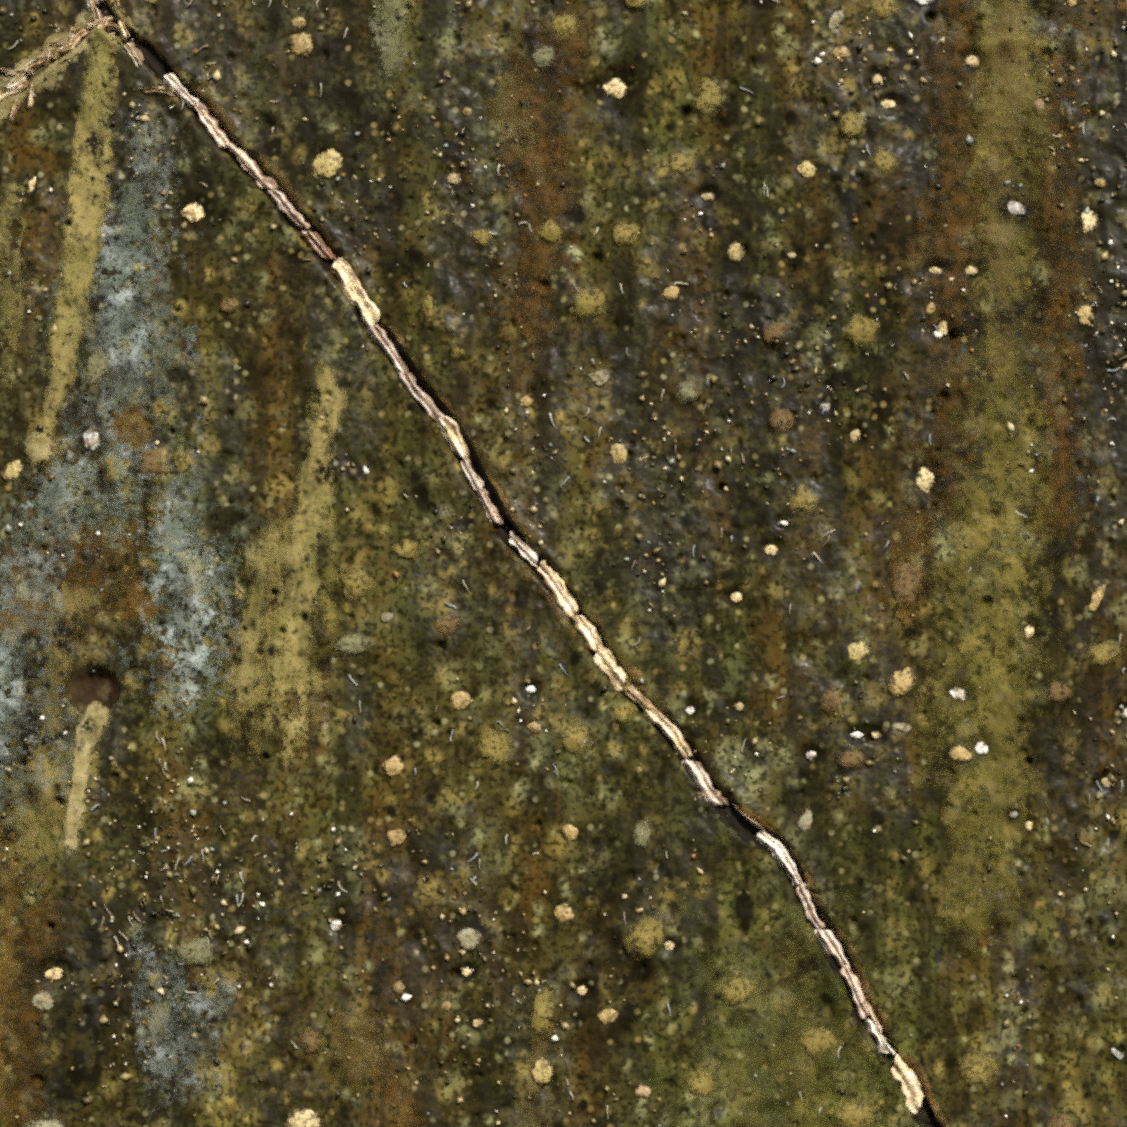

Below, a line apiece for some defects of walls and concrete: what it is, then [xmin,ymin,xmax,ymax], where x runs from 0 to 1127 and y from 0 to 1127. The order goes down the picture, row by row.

water stain [0,581,110,873]
water stain [24,28,122,468]
water stain [227,360,347,763]
crack [0,0,767,850]
water stain [913,0,1057,953]
crack [737,806,948,1127]